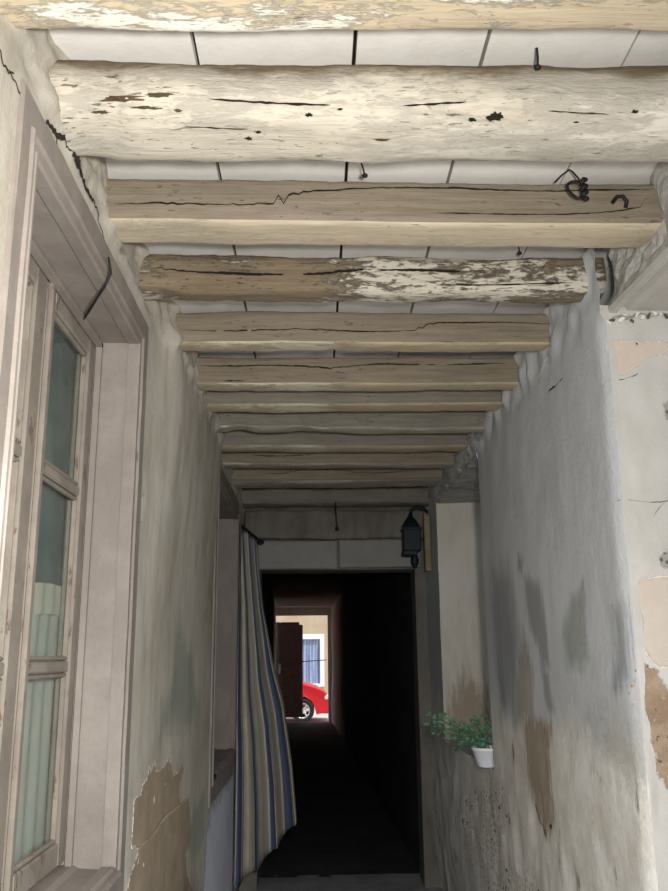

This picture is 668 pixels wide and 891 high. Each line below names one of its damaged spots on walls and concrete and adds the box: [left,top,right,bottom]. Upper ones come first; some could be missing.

crack [0,49,20,94]
crack [42,114,103,234]
peeling [628,553,668,788]
peeling [128,758,193,891]